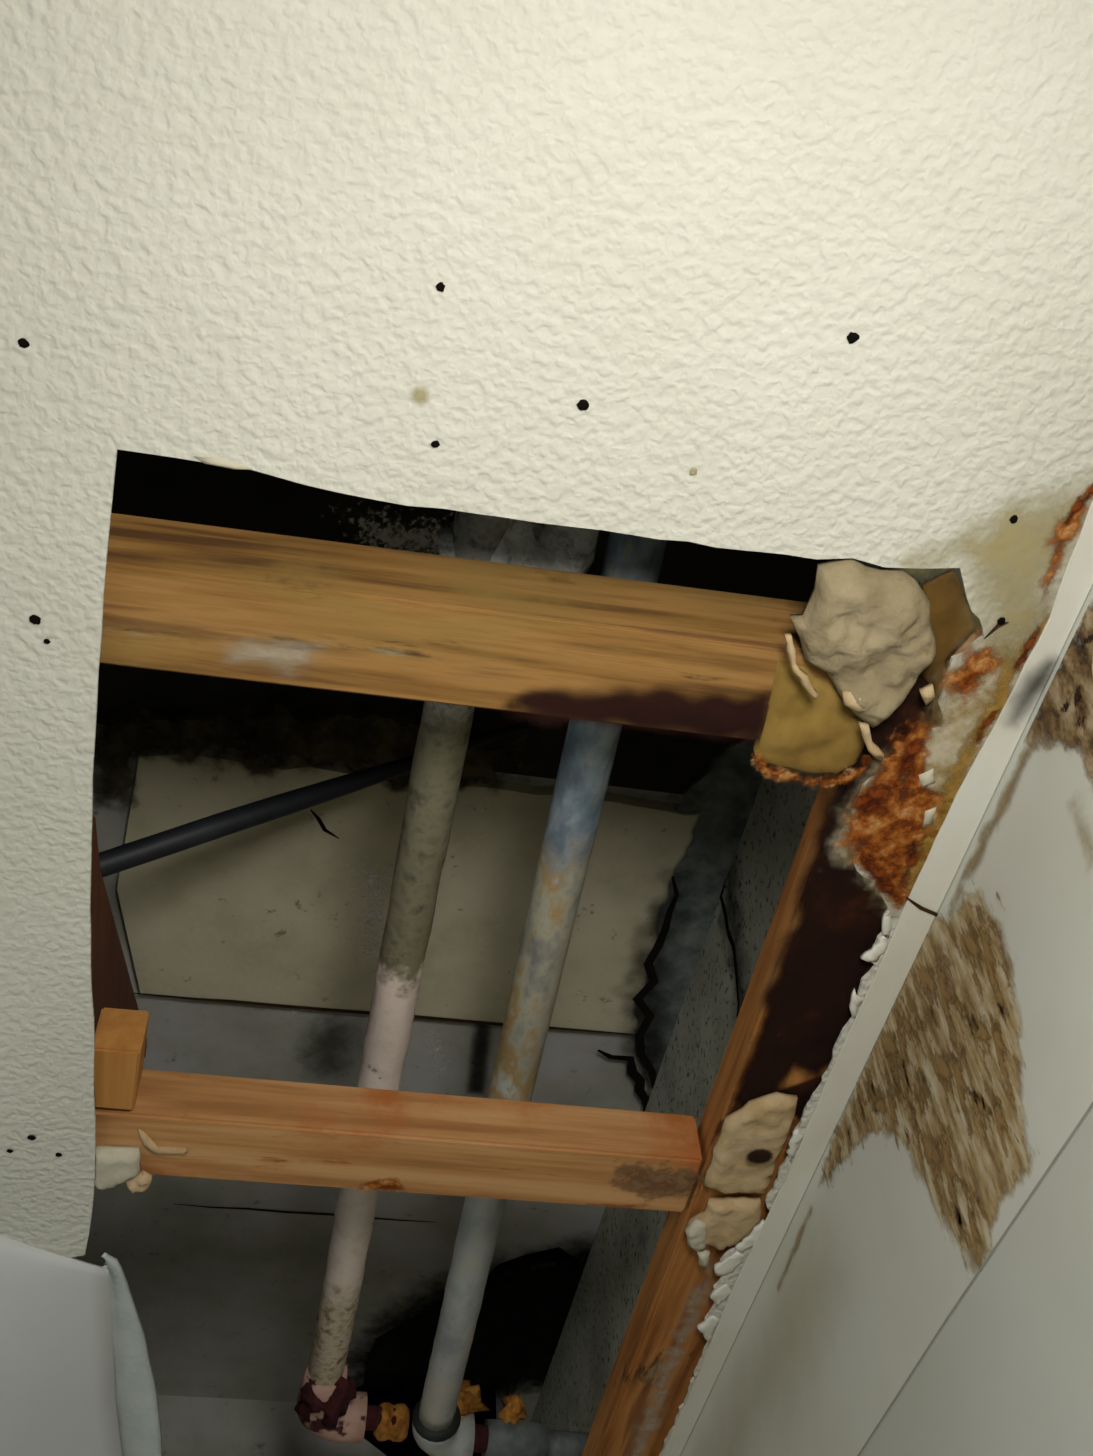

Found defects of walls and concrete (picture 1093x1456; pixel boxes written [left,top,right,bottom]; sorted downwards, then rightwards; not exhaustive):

peeling [194,456,253,470]
peeling [784,633,818,699]
corrosion [940,647,1001,704]
damp [508,689,883,788]
corrosion [835,722,950,908]
crack [720,879,739,1017]
peeling [860,908,892,962]
crack [597,876,679,1112]
peeling [849,988,863,1019]
peeling [125,1170,153,1193]
peeling [685,1218,765,1343]
spalling [357,1383,429,1456]